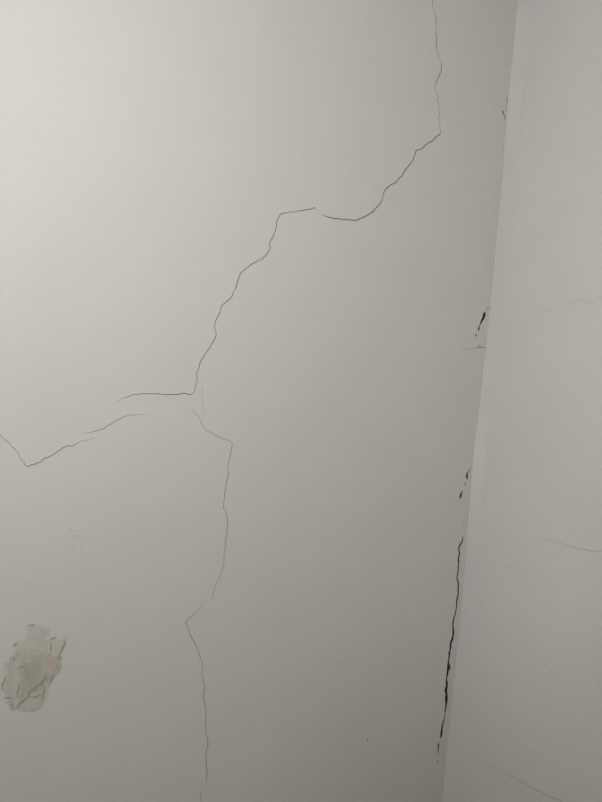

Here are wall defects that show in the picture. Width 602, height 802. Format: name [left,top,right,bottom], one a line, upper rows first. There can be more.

crack [0,0,442,798]
crack [460,307,490,350]
crack [437,466,471,763]